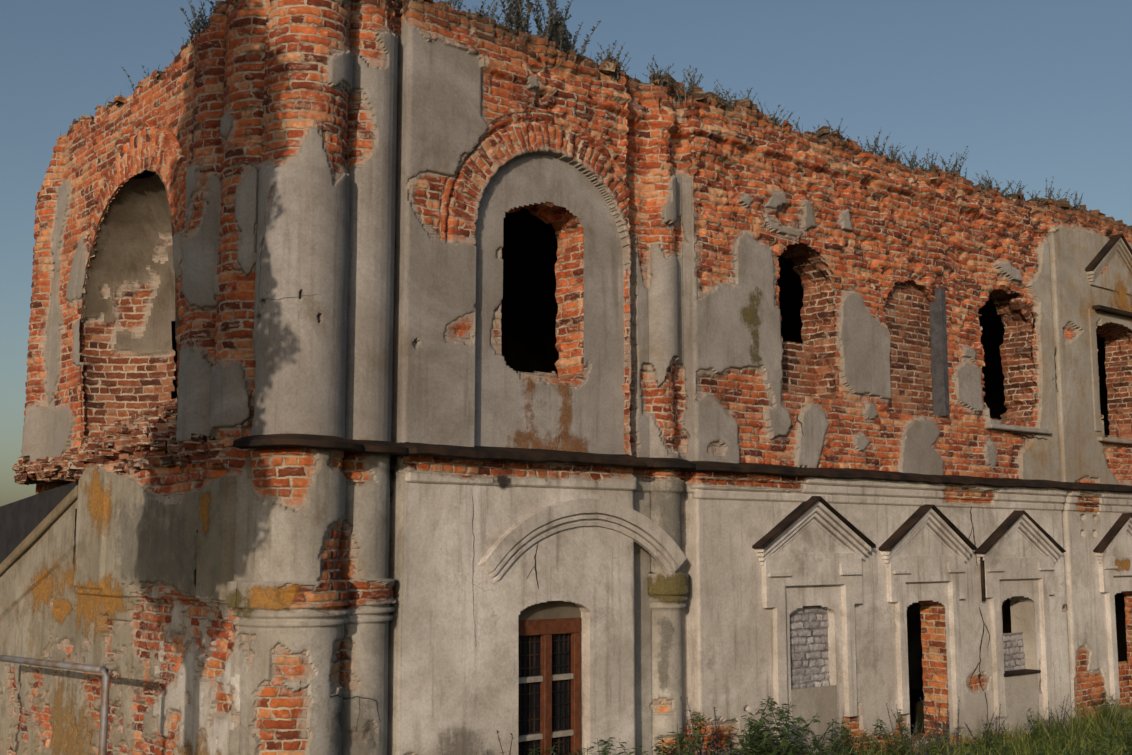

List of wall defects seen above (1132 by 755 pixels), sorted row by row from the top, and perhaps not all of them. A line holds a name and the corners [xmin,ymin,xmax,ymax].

spalling [812,126,840,144]
flaking render [21,0,829,511]
flaking render [838,209,853,232]
spalling [1006,196,1087,211]
flaking render [838,293,891,420]
flaking render [954,347,1003,424]
flaking render [898,418,998,506]
spalling [280,519,399,614]
crack [527,543,539,589]
crack [969,506,977,564]
spalling [1,581,359,755]
crack [968,607,990,718]